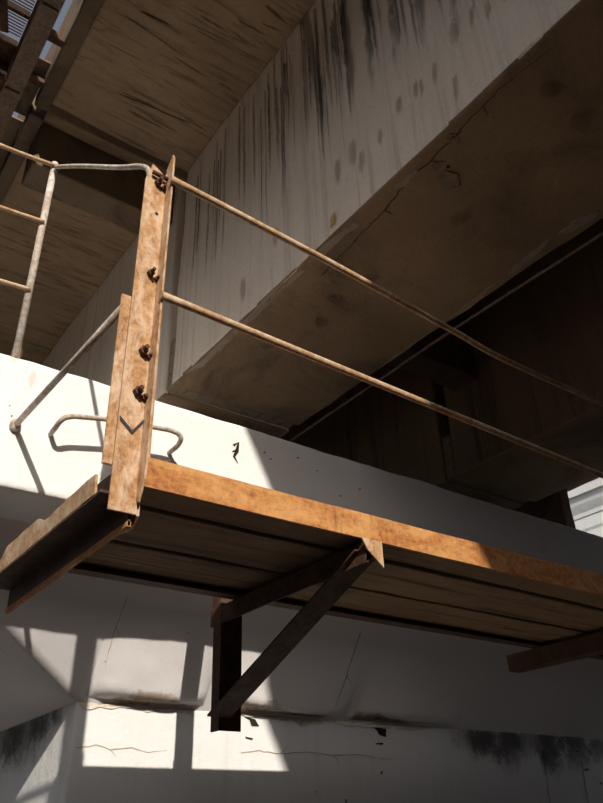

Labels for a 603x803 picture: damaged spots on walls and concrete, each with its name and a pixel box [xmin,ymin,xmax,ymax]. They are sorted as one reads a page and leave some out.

crack [417,41,559,171]
crack [321,187,404,275]
crack [241,746,381,760]